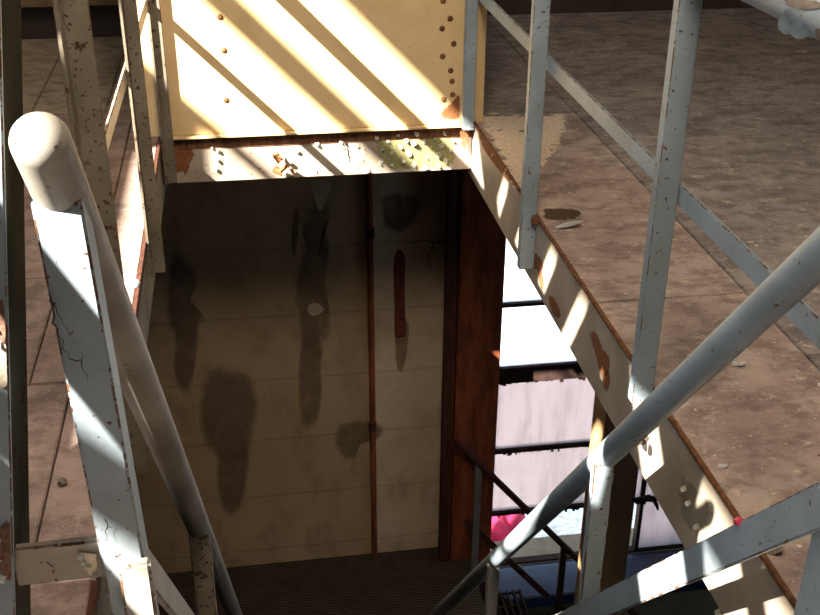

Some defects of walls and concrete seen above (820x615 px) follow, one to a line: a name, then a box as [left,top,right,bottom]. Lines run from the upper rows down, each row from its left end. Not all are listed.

peeling [778,0,820,40]
corrosion [173,96,472,175]
crack [48,294,88,381]
water stain [168,255,202,389]
water stain [292,207,329,424]
corrosion [394,250,406,338]
corrosion [591,332,610,391]
water stain [203,372,254,510]
peeling [0,522,12,584]